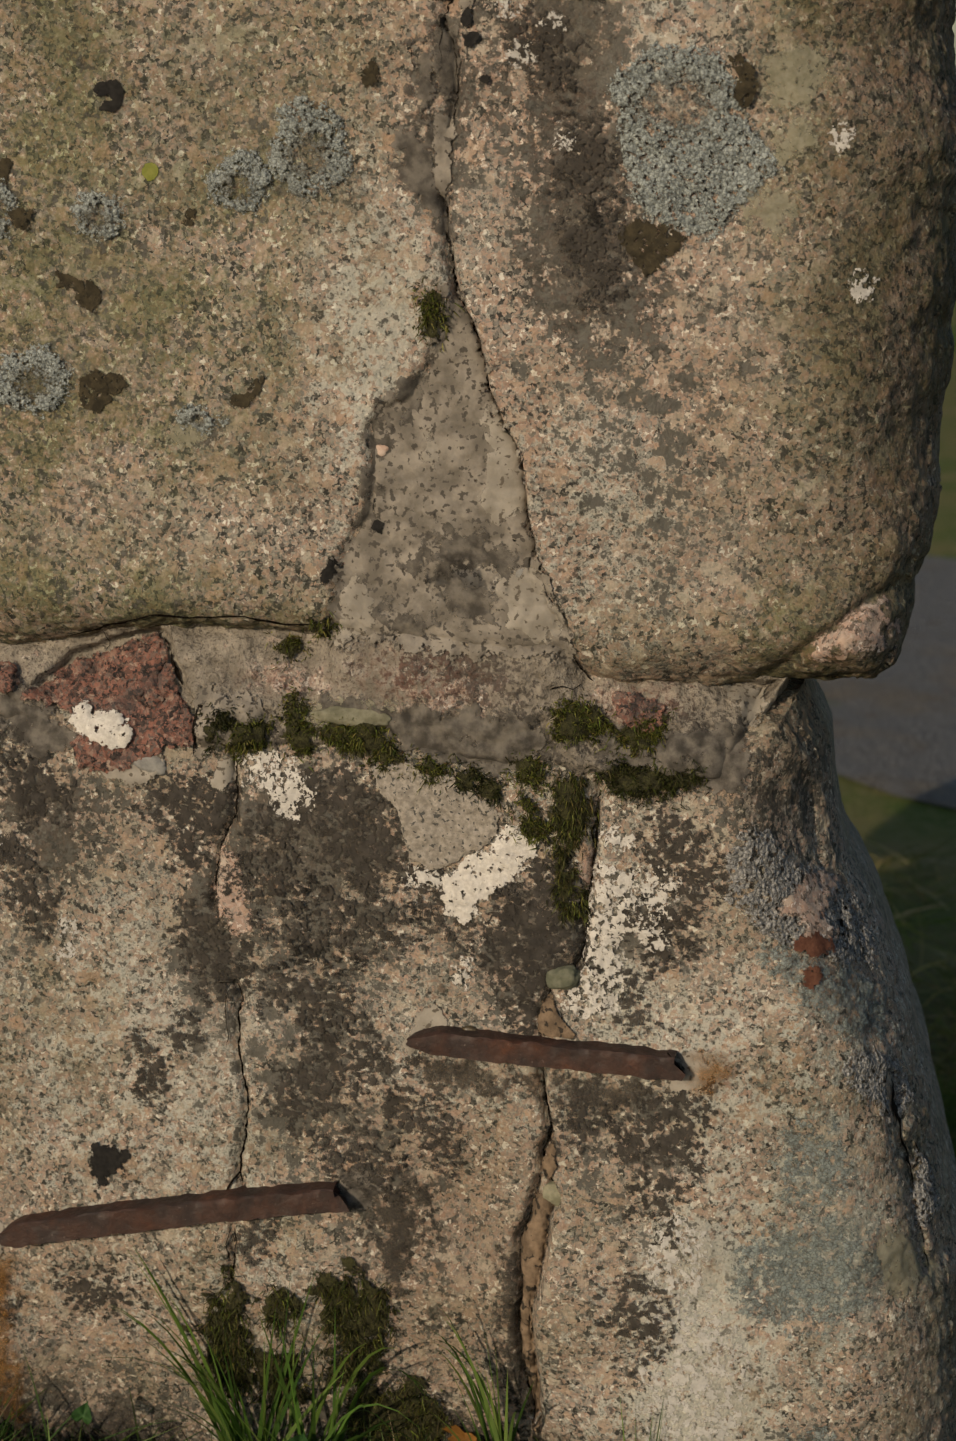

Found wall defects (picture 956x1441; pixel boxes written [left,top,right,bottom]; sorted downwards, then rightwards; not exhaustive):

leakage [383,0,479,271]
crack [409,0,459,119]
leakage [499,0,687,321]
crack [445,204,495,402]
crack [539,793,600,1037]
crack [216,982,249,1190]
leakage [121,750,735,1380]
crack [520,1072,554,1238]
leakage [0,1276,28,1322]
leakage [50,1257,154,1324]
crack [226,1227,237,1282]
crack [527,1372,537,1430]